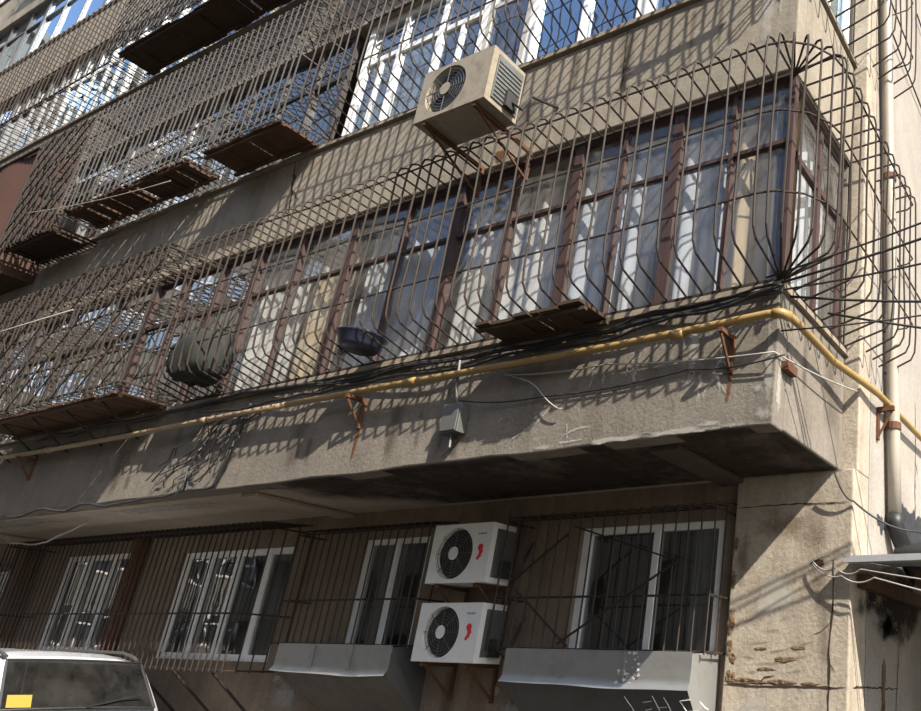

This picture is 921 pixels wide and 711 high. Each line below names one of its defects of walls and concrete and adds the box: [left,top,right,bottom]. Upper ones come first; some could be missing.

water stain [762,0,782,36]
spalling [725,608,818,686]
crack [724,558,903,711]